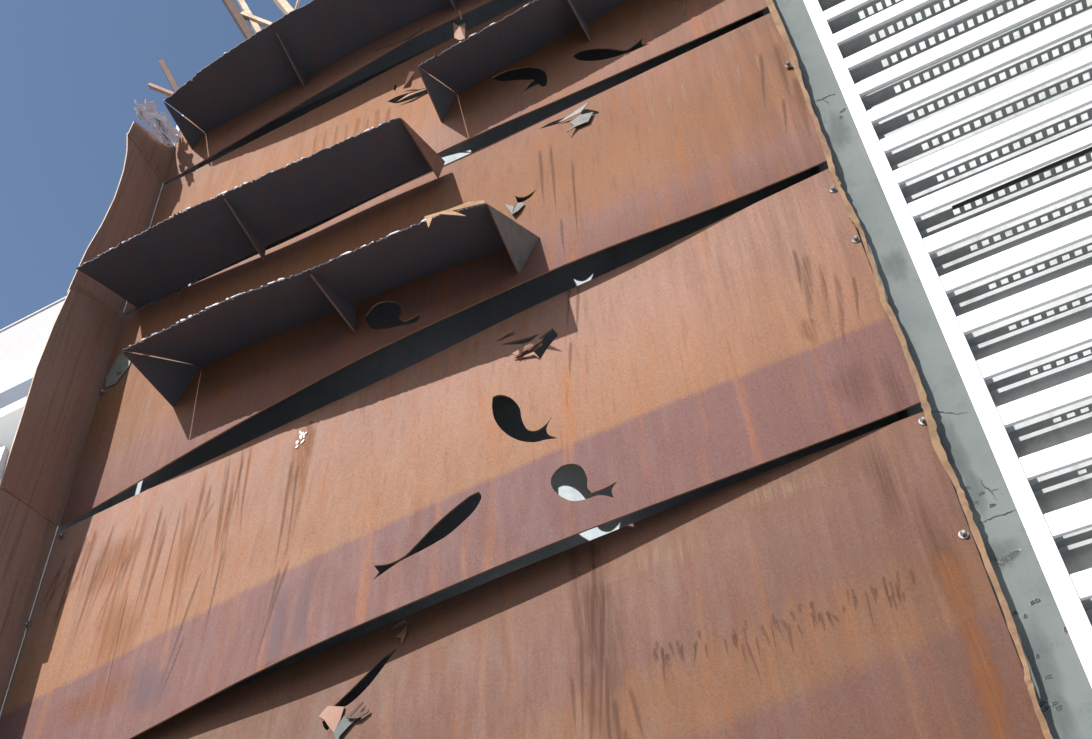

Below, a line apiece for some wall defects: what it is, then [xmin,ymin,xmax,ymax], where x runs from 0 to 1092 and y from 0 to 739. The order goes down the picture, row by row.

peeling [135,99,182,147]